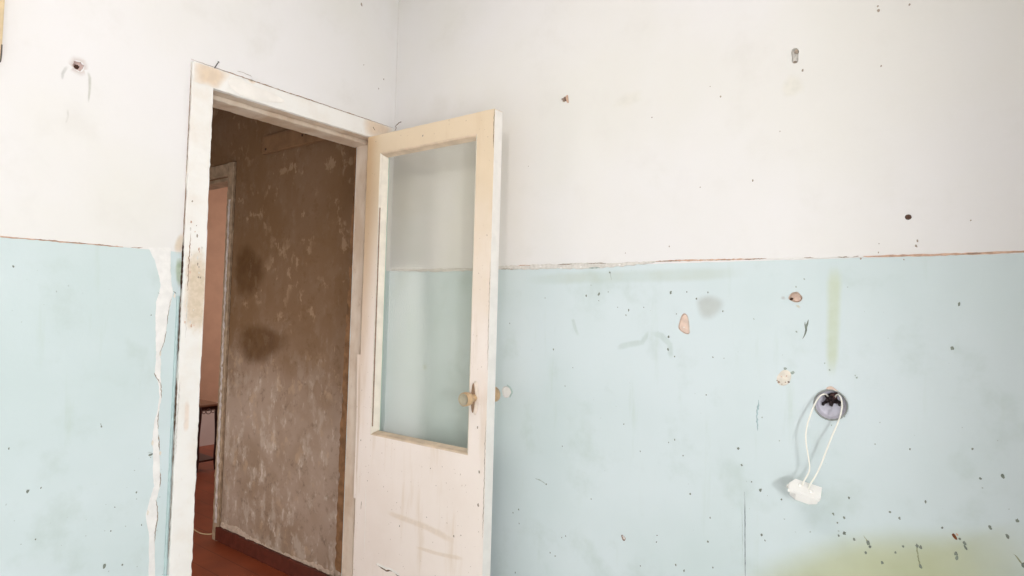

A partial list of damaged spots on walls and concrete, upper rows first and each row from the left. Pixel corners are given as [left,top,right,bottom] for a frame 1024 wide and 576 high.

peeling [0,236,176,576]
leakage [228,230,307,379]
flaking render [667,313,690,357]
flaking render [777,278,805,311]